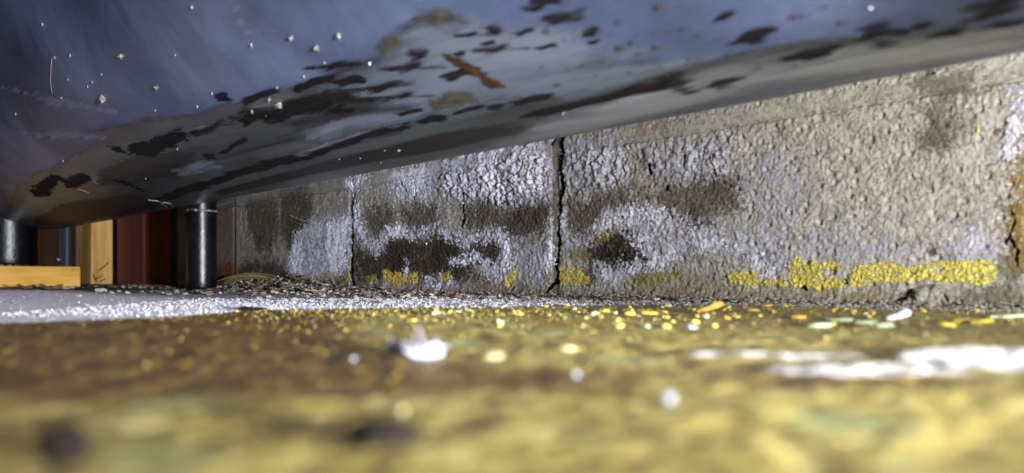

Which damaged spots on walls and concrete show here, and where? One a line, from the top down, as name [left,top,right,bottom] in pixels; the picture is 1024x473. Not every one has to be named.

rust [444,53,505,89]
leakage [996,80,1024,166]
crack [545,137,566,294]
leakage [237,127,1014,295]